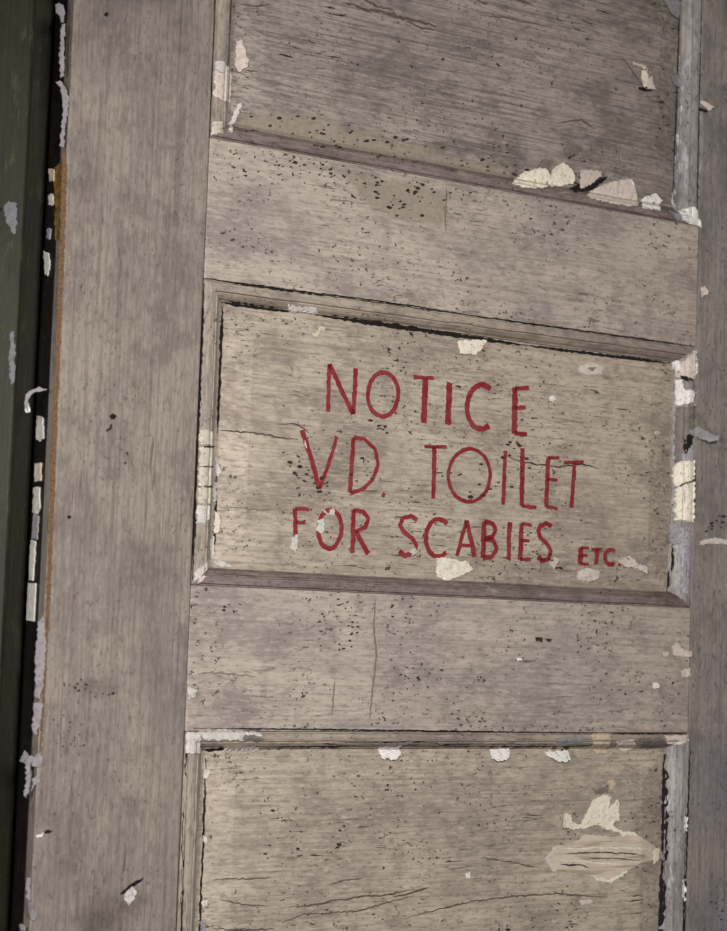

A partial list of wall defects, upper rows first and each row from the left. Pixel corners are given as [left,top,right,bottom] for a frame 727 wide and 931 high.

peeling [210,0,714,228]
peeling [24,387,47,442]
peeling [435,557,474,581]
peeling [378,746,402,760]
peeling [185,729,265,931]
peeling [545,779,660,884]